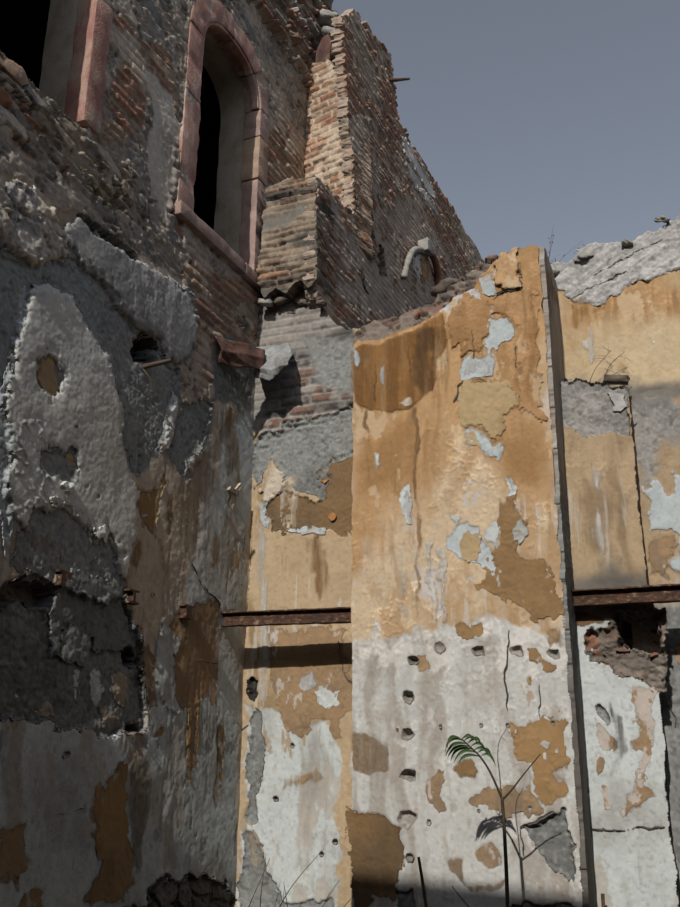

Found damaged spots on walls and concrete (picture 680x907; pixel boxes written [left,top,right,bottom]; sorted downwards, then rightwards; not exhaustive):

peeling [0,178,222,783]
damp [351,313,447,412]
peeling [447,247,548,461]
peeling [446,477,565,645]
flaking render [560,374,632,438]
peeling [84,676,334,907]
peeling [267,624,388,775]
peeling [344,806,416,907]
peeling [425,758,478,812]
crack [502,631,510,710]
peeling [468,711,577,881]
flaking render [576,606,680,817]